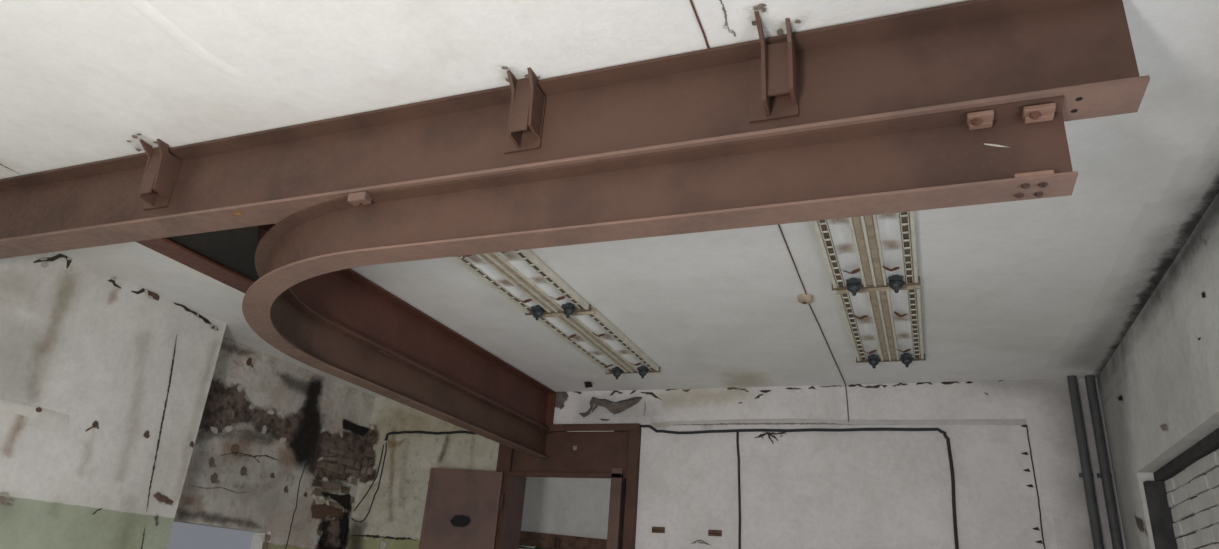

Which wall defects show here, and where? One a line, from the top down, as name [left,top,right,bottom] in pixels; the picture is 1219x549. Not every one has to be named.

leakage [1099,182,1219,373]
flaking render [199,379,379,549]
flaking render [555,392,569,409]
flaking render [579,382,646,421]